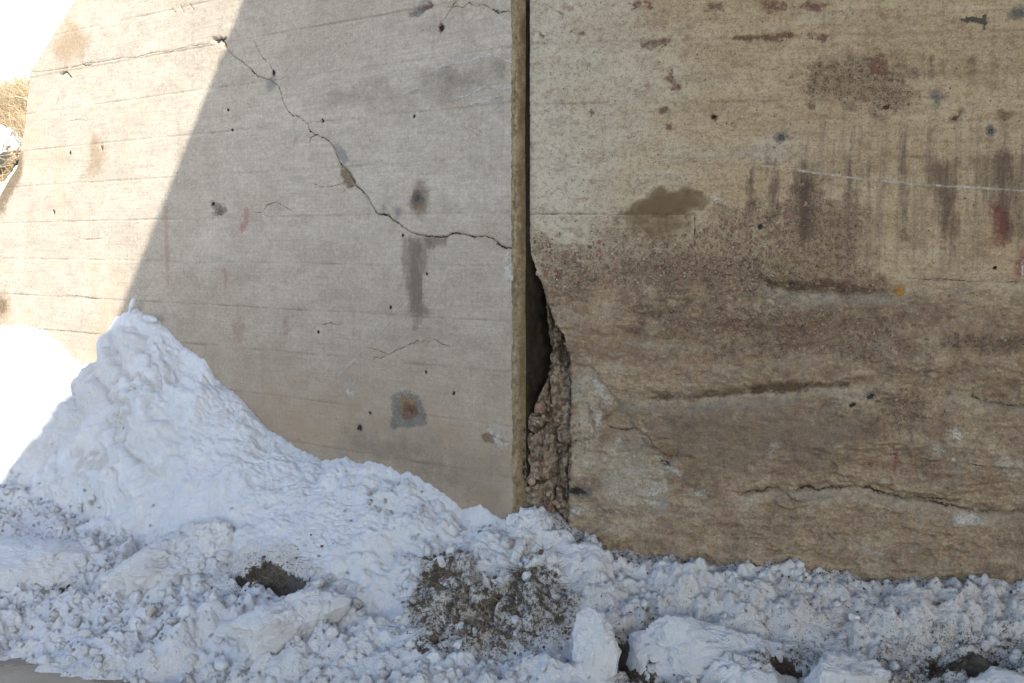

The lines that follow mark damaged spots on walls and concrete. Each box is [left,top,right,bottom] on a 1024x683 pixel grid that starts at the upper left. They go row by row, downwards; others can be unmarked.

crack [32,38,512,249]
damp [627,187,721,233]
spalling [525,172,932,523]
crack [747,485,1023,513]